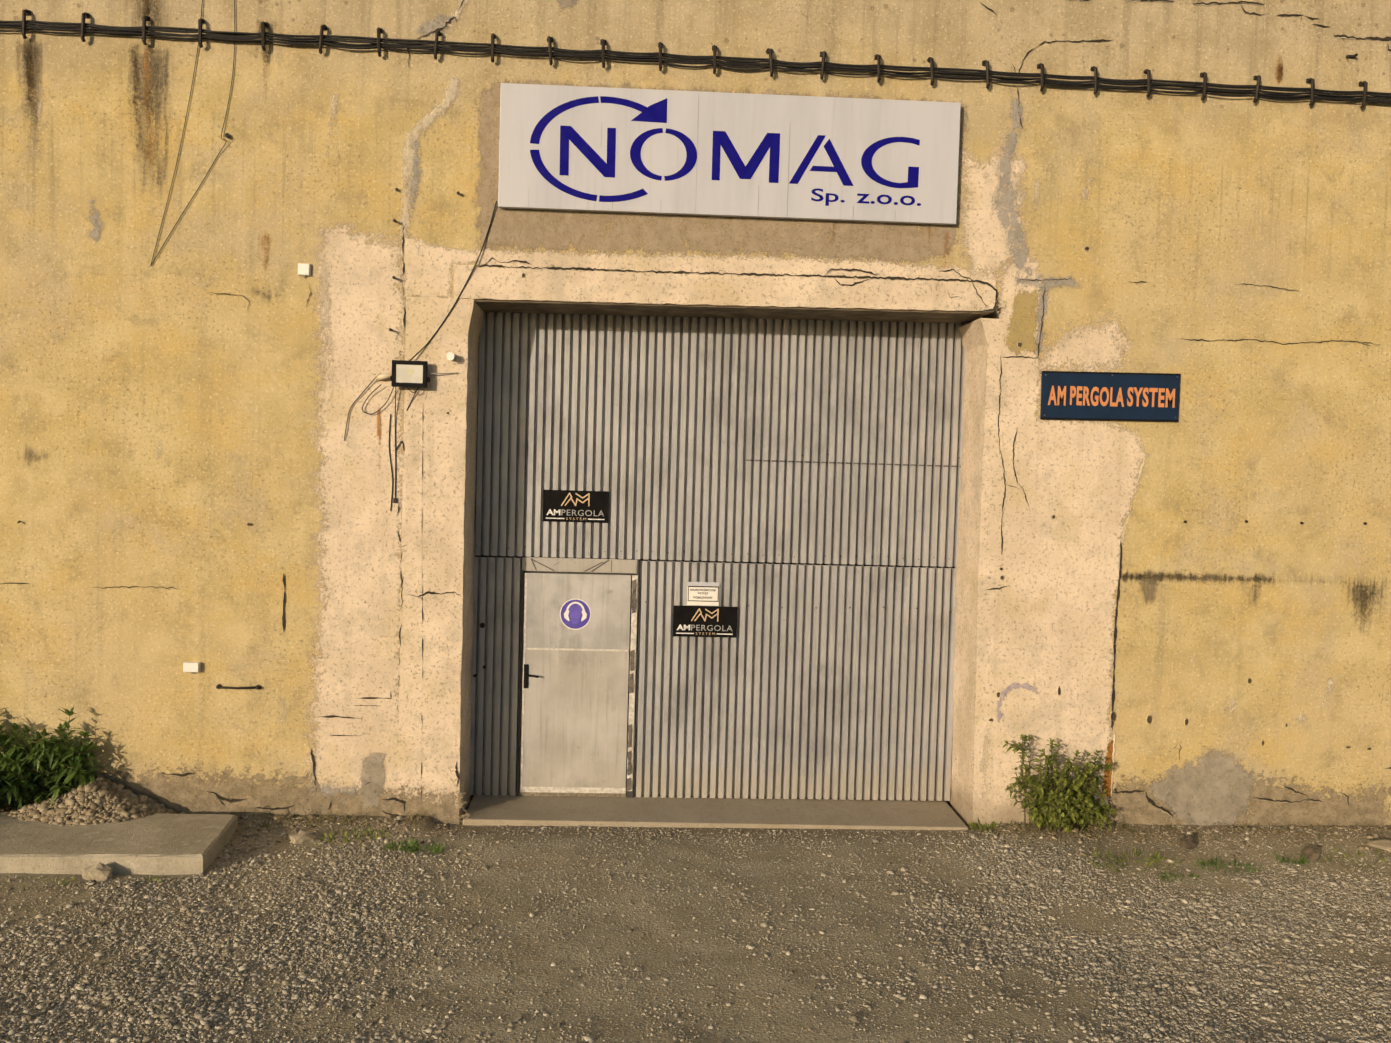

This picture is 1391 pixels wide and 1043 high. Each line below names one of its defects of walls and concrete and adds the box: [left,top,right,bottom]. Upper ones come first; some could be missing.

crack [407,0,469,66]
crack [1128,0,1391,51]
water stain [17,38,42,137]
crack [400,78,459,331]
crack [476,39,1111,591]
crack [1181,338,1373,346]
water stain [1122,572,1272,603]
water stain [1353,584,1383,618]
rust [1102,731,1116,797]